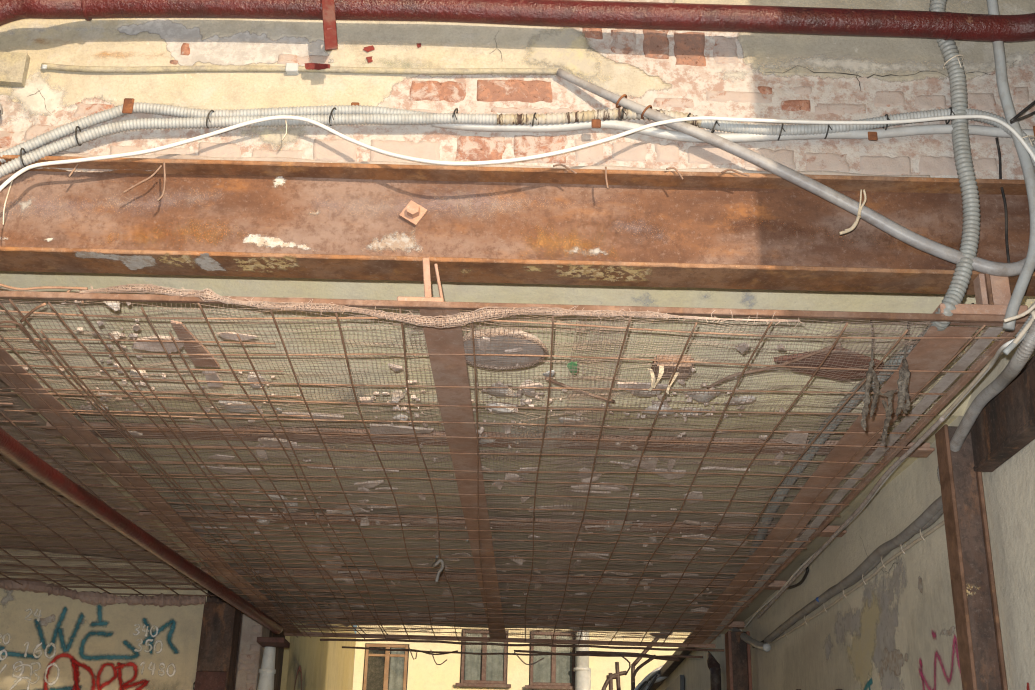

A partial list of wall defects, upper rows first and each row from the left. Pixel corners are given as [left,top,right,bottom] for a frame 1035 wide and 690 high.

flaking render [118,18,334,66]
flaking render [0,27,958,178]
flaking render [962,52,1035,180]
peeling [835,557,923,690]